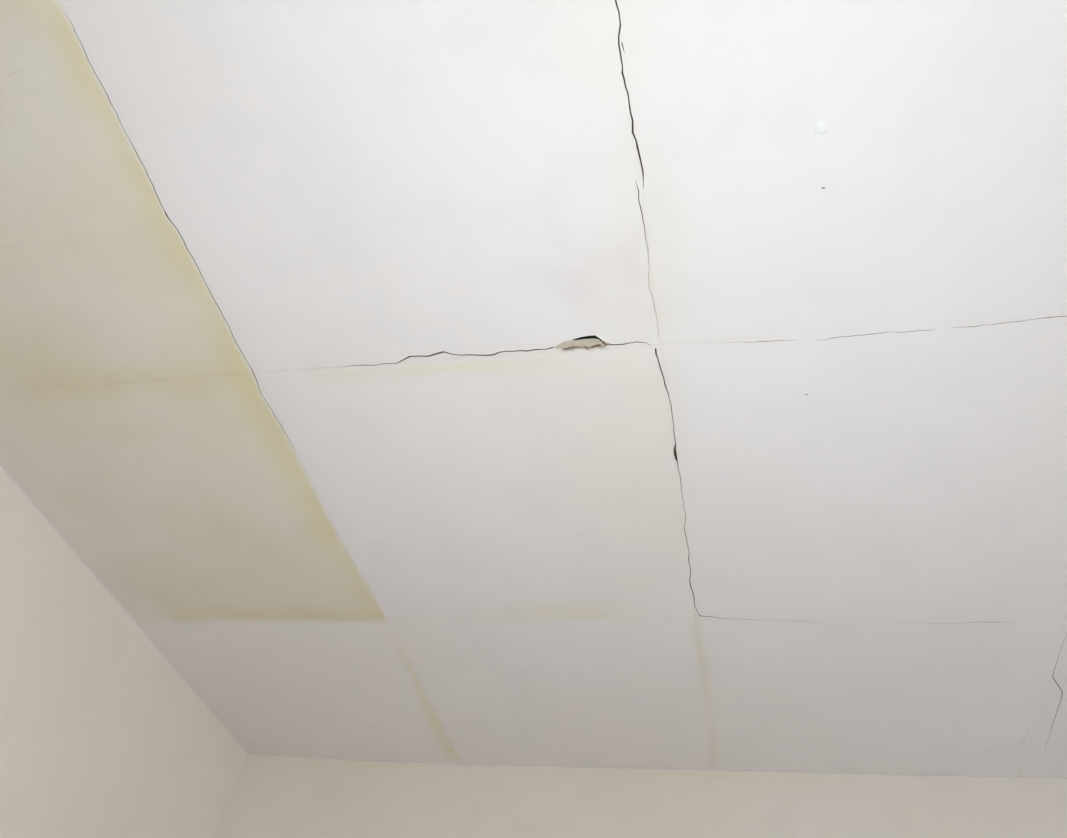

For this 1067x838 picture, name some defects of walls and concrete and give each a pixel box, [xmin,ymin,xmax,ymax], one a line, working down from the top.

crack [69,20,380,606]
leakage [0,0,881,794]
crack [340,347,553,369]
flaking render [553,335,610,353]
crack [602,0,814,622]
crack [1026,634,1067,750]